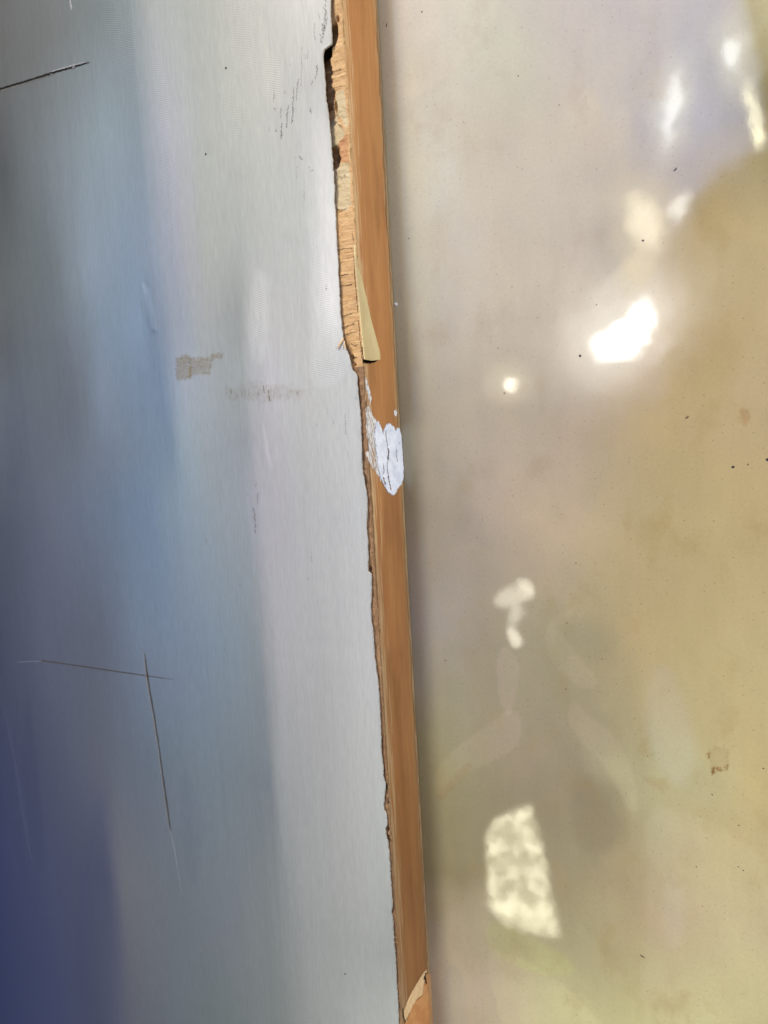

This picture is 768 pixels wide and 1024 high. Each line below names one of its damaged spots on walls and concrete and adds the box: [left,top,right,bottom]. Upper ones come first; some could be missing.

spalling [324,0,365,368]